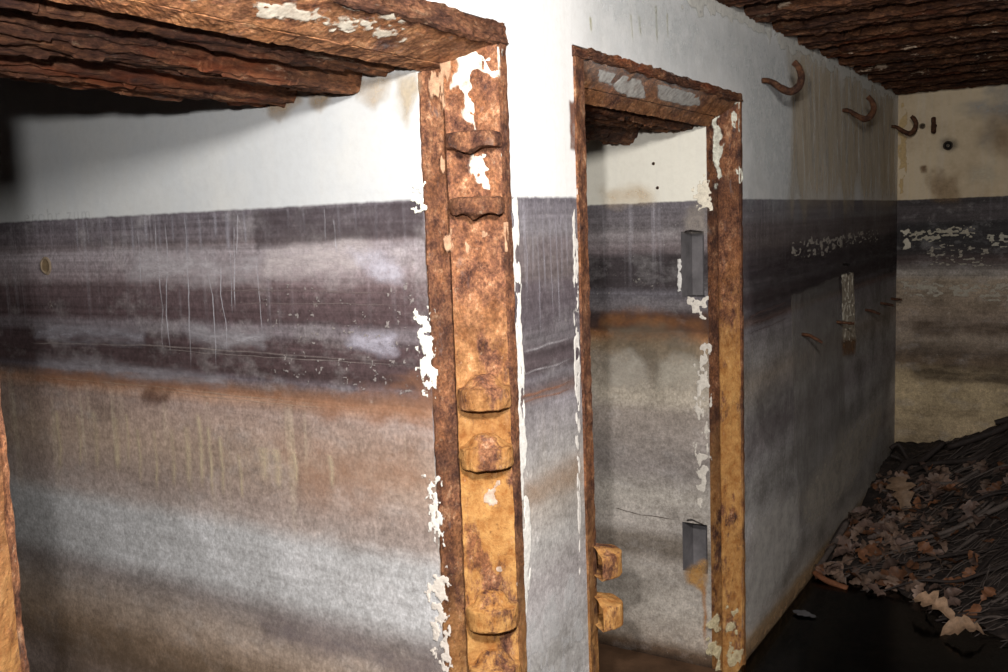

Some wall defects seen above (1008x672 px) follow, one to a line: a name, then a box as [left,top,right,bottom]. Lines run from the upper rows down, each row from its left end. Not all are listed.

leakage [266,245,399,278]
peeling [791,230,878,257]
peeling [900,225,1008,267]
peeling [693,343,712,508]
peeling [423,474,445,547]
peeling [424,566,453,672]